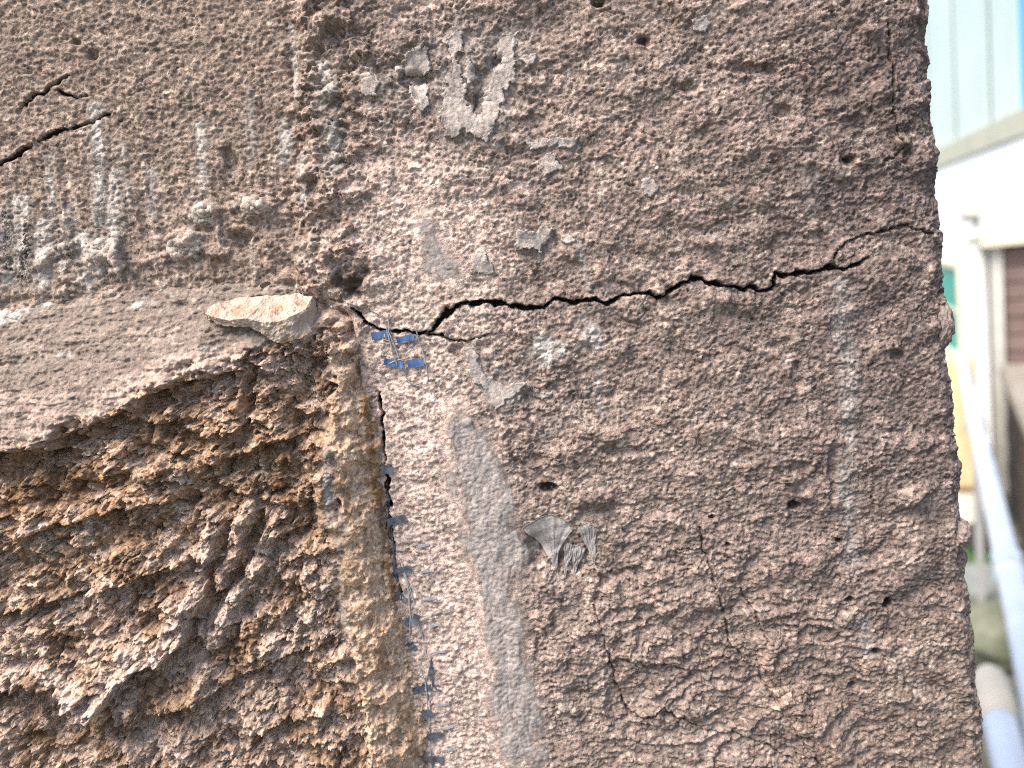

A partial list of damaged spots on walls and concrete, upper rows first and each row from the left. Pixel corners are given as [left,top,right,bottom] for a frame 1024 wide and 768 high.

crack [23,80,75,106]
crack [0,114,111,166]
crack [351,244,865,340]